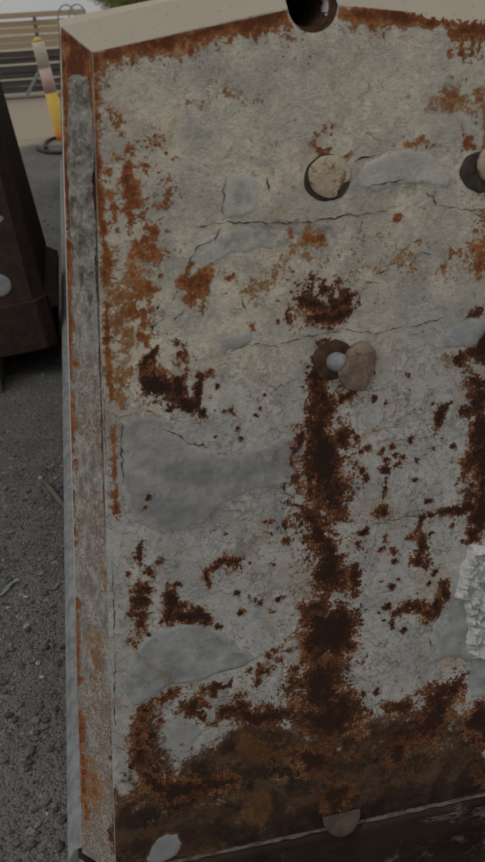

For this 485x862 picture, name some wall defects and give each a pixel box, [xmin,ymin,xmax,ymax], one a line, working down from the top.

leakage [326,352,346,373]
leakage [241,791,272,826]